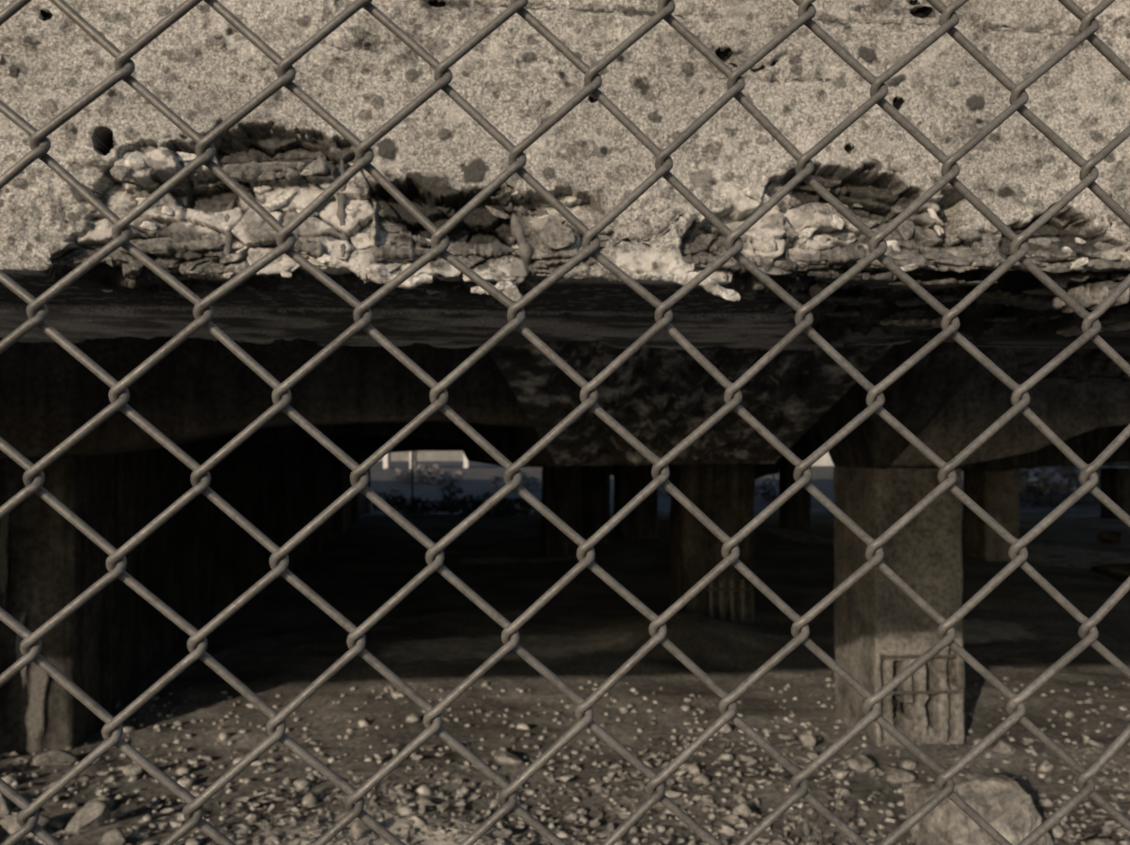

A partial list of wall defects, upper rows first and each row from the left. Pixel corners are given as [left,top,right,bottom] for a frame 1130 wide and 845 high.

spalling [32,127,617,308]
spalling [680,167,1130,390]